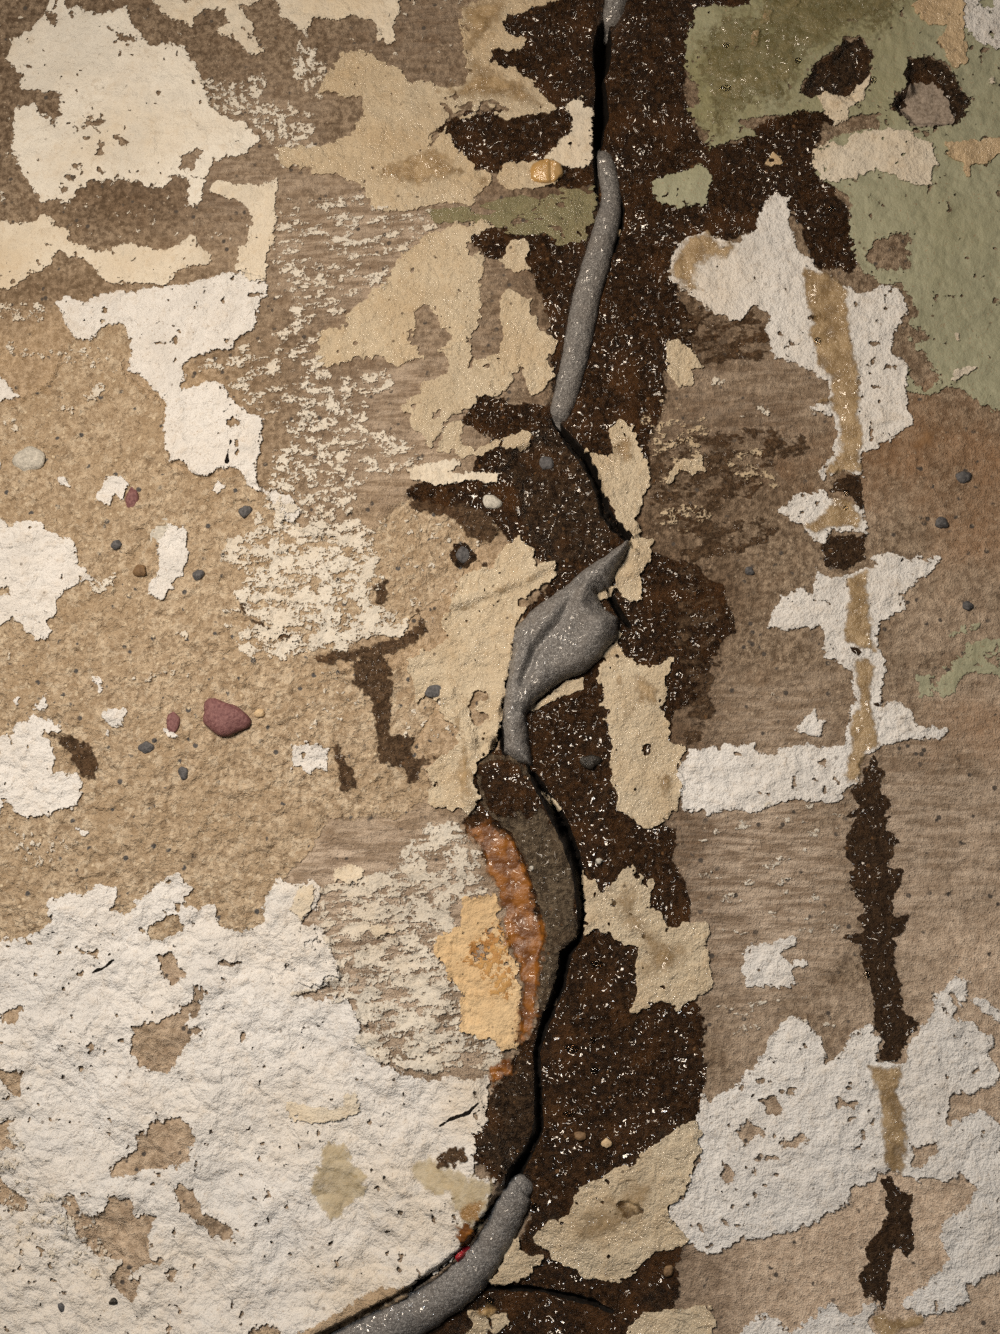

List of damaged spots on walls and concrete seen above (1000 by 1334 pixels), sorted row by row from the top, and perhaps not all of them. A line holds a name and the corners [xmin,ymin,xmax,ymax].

crack [592,21,625,252]
peeling [652,0,1000,544]
crack [552,419,634,541]
peeling [0,0,716,1334]
crack [608,593,631,628]
crack [412,670,587,1291]
corrosion [489,1058,512,1087]
corrosion [457,820,545,1040]
peeling [489,865,1000,1319]
crack [483,1284,615,1313]
peeling [740,1301,879,1334]